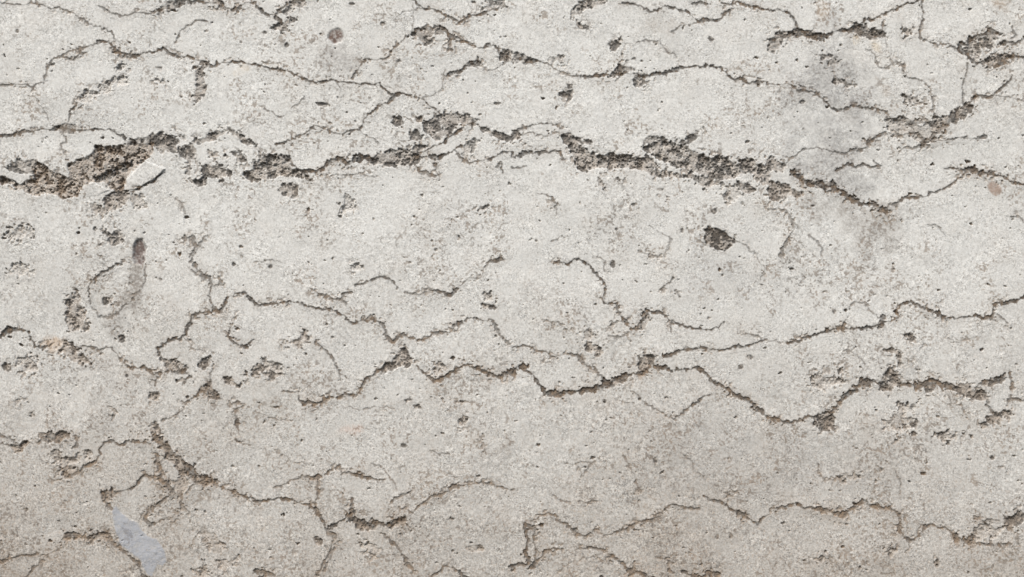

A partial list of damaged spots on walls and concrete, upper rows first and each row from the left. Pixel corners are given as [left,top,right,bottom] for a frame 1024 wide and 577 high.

spalling [0,121,310,380]
spalling [368,98,518,173]
crack [0,0,1024,241]
spalling [556,122,842,218]
spalling [8,393,38,421]
crack [0,190,1024,577]